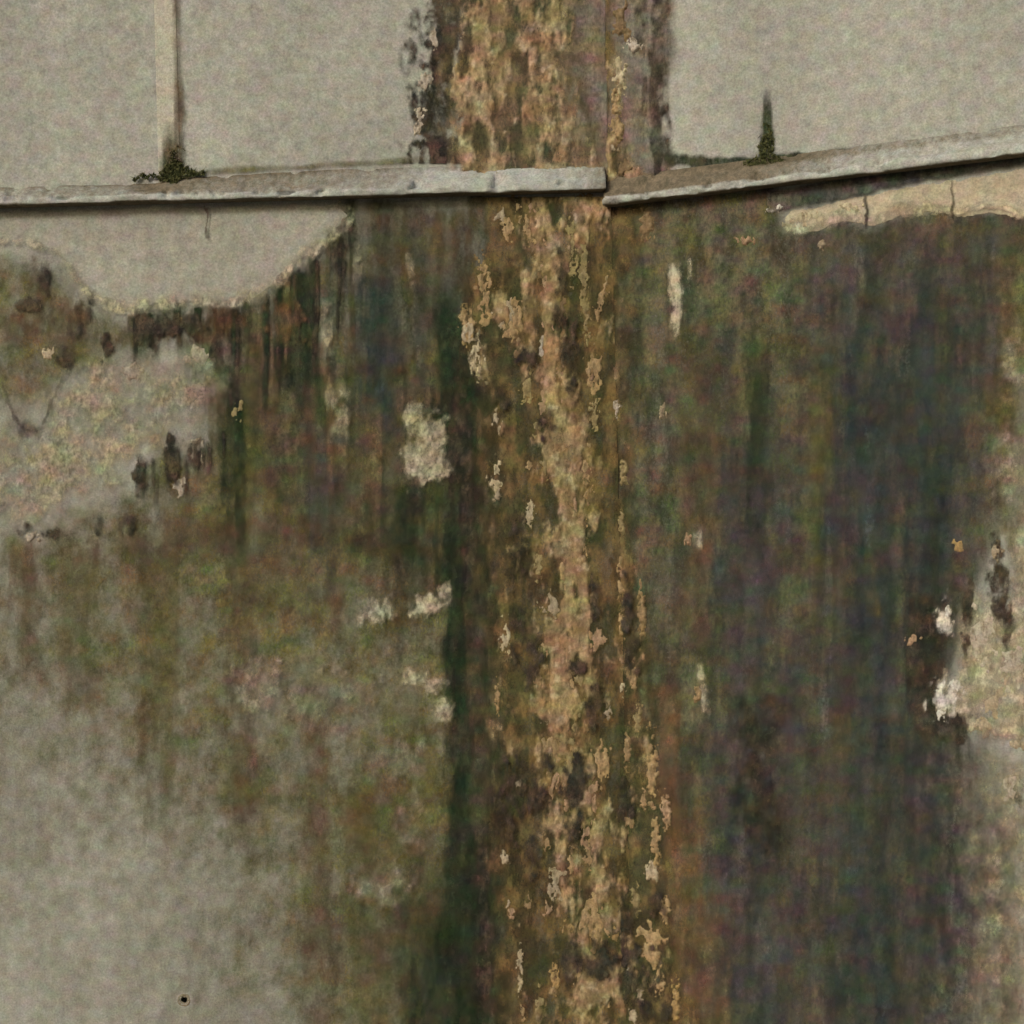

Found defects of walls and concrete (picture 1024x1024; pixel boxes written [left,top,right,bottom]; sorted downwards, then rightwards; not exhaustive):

water stain [162,80,184,182]
peeling [413,106,428,141]
peeling [429,26,439,51]
peeling [445,0,645,183]
water stain [605,0,801,177]
crack [861,194,869,227]
peeling [765,157,1024,251]
crack [948,186,956,217]
water stain [128,196,517,1024]
peeling [458,193,682,1024]
water stain [611,188,1024,1024]
spalling [904,509,1024,751]